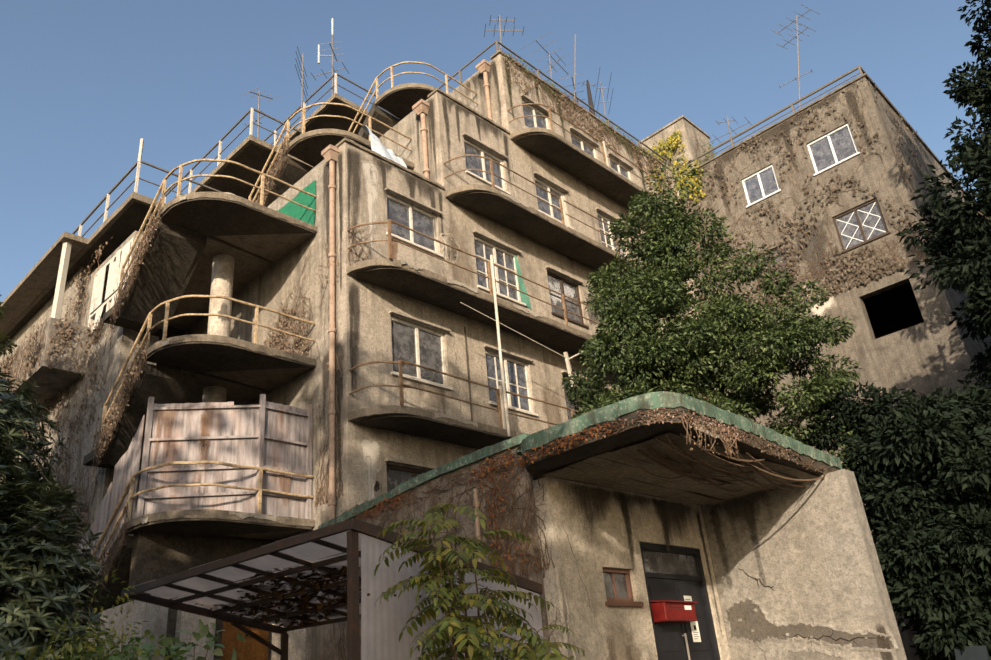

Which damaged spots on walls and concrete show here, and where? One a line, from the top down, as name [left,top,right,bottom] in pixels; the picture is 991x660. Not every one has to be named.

leakage [620,495,634,565]
leakage [657,502,670,557]
leakage [697,493,768,622]